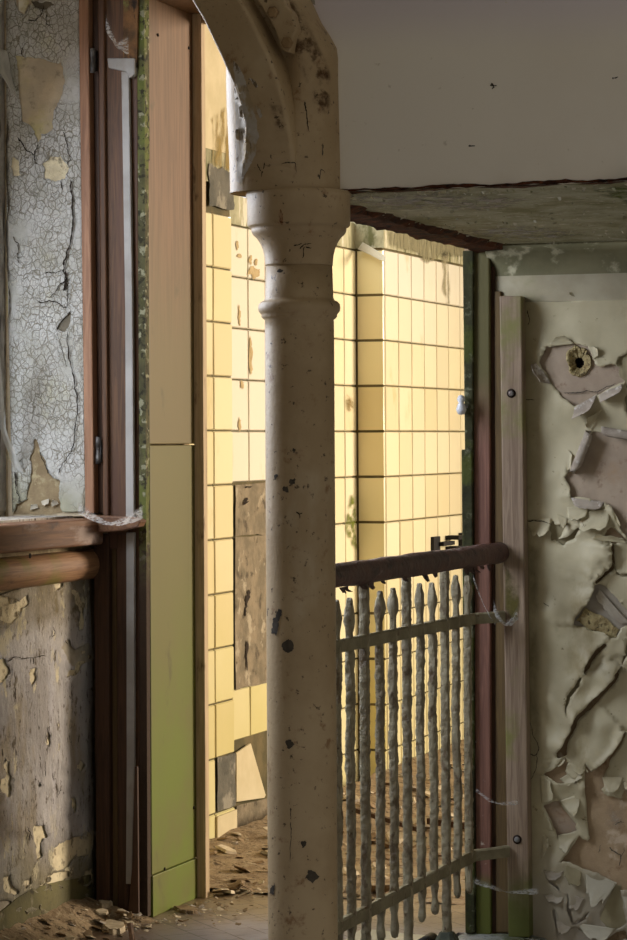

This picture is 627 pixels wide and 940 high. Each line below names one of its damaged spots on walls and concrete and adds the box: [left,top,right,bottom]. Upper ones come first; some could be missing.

spalling [16,0,54,15]
spalling [16,56,65,142]
crack [6,124,38,315]
crack [38,132,74,308]
rust [343,177,627,194]
crack [40,331,78,474]
spalling [13,439,62,515]
spalling [0,596,29,629]
spalling [61,639,94,678]
peeling [528,336,627,940]
spalling [217,743,267,827]
spalling [0,825,96,914]